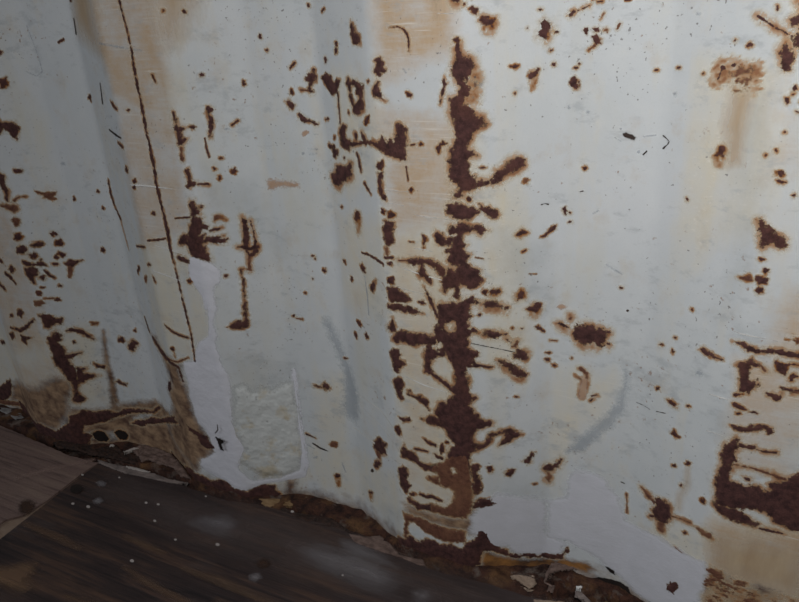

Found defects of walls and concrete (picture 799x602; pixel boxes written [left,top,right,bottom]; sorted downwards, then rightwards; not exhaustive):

rust [350,21,362,47]
rust [448,0,499,35]
rust [0,119,21,141]
rust [171,105,238,190]
rust [701,58,765,168]
rust [783,84,799,105]
rust [774,169,788,185]
rust [737,217,789,295]
rust [553,305,613,351]
rust [571,356,600,403]
rust [698,333,799,536]
rust [666,581,678,595]